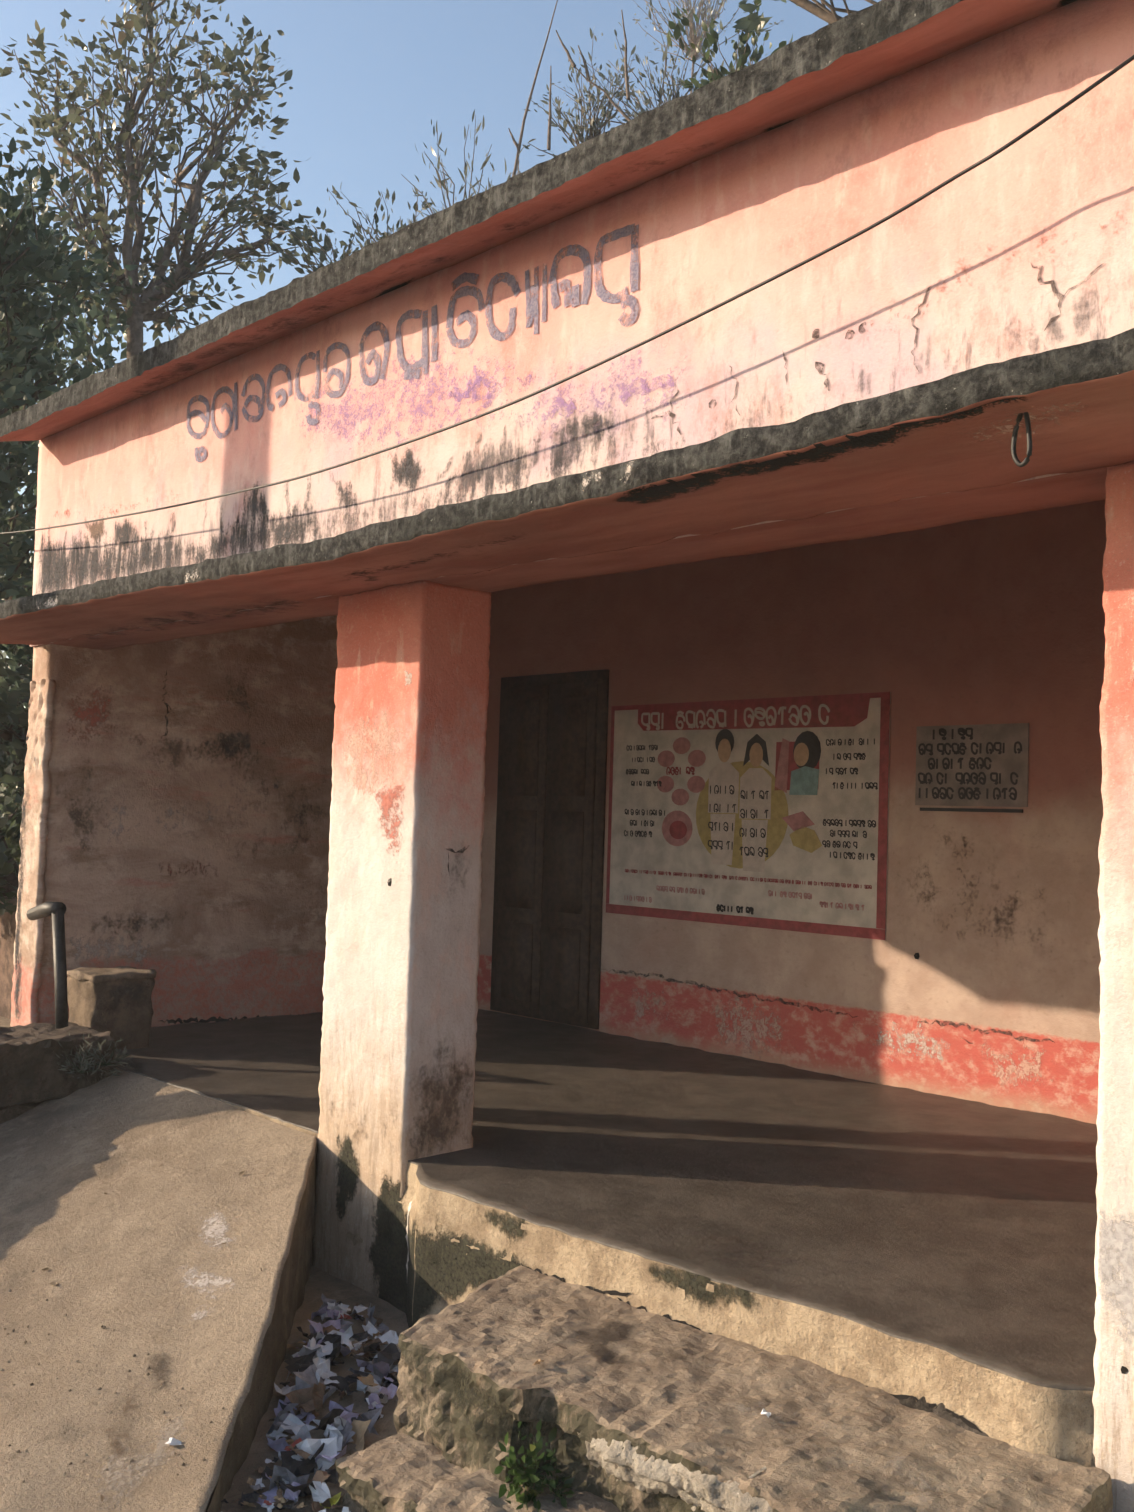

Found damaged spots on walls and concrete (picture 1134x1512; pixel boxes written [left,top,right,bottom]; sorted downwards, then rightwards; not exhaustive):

crack [911,287,930,373]
crack [1030,262,1103,331]
damp [39,412,627,593]
peeling [877,1024,950,1060]
peeling [982,1044,1044,1086]
damp [336,1135,360,1220]
damp [368,1175,524,1328]
spalling [578,1433,773,1512]